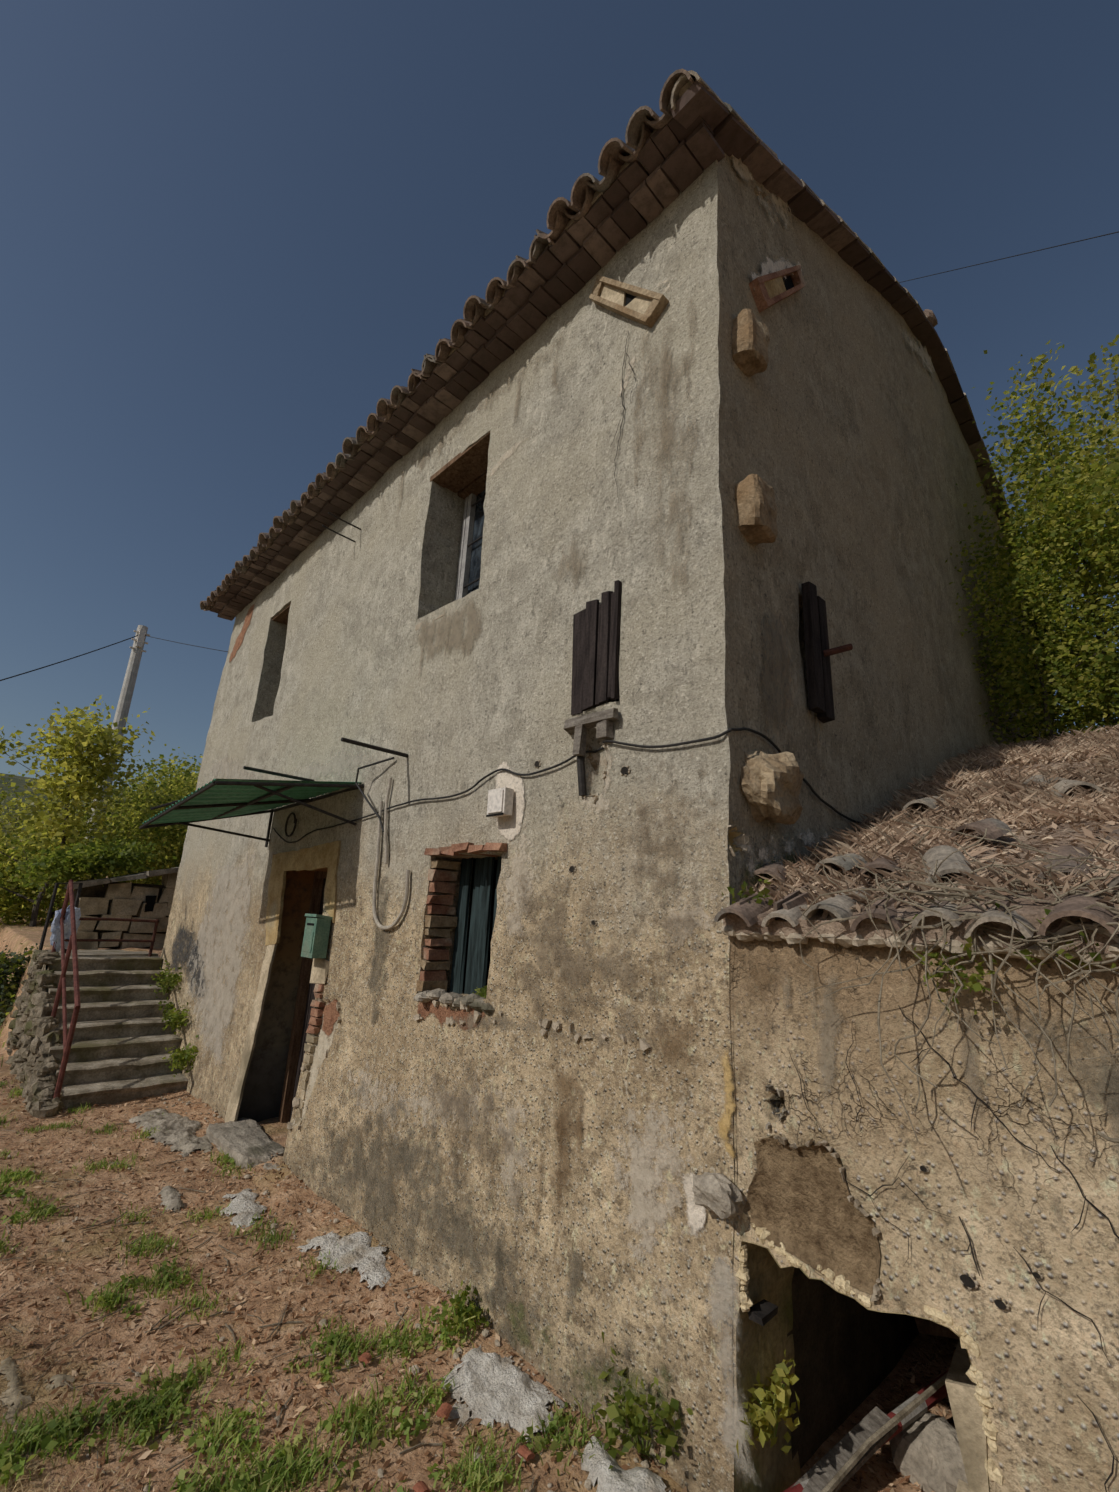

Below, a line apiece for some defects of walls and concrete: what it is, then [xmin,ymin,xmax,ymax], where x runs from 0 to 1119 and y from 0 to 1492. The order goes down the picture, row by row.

crack [609,332,636,497]
spalling [287,996,342,1130]
leakage [309,1062,528,1308]
leakage [614,1101,696,1257]
peeling [735,1084,882,1312]
leakage [566,1252,582,1315]
spalling [924,1305,1004,1485]